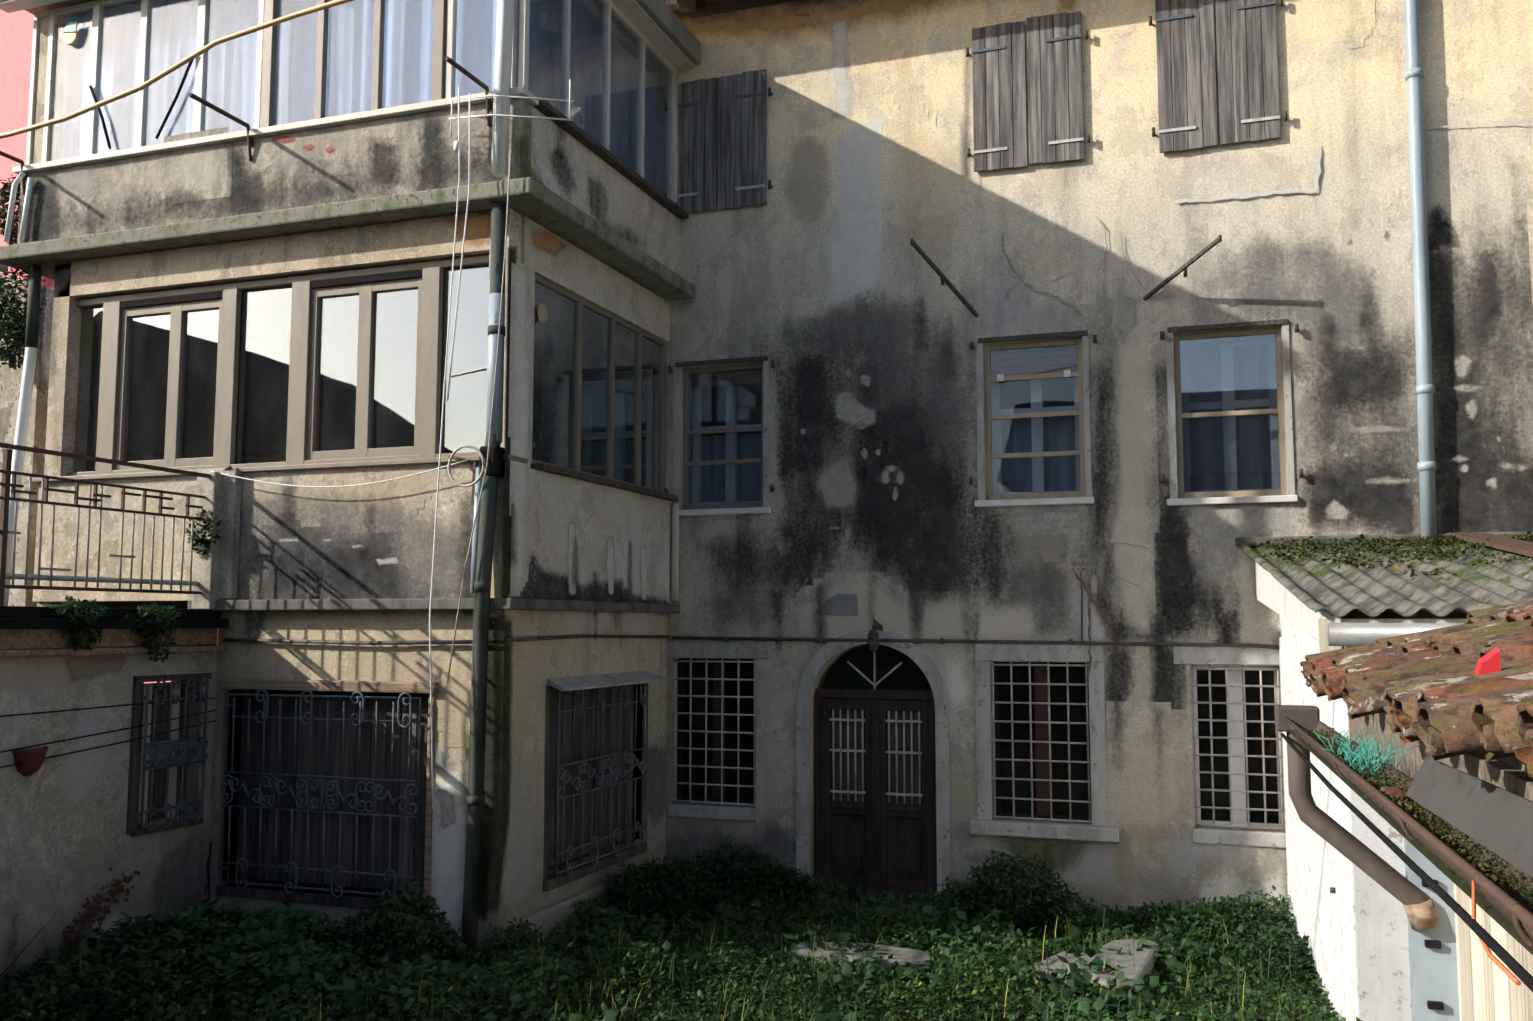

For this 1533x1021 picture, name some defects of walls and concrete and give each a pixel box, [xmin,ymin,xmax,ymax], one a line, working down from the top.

mould [25,111,499,241]
mould [516,139,605,226]
water stain [237,482,475,766]
water stain [485,615,544,921]
water stain [508,506,668,638]
mould [714,302,1066,644]
water stain [1080,366,1239,885]
water stain [1180,853,1288,933]
water stain [1226,243,1416,534]
water stain [1429,173,1533,533]